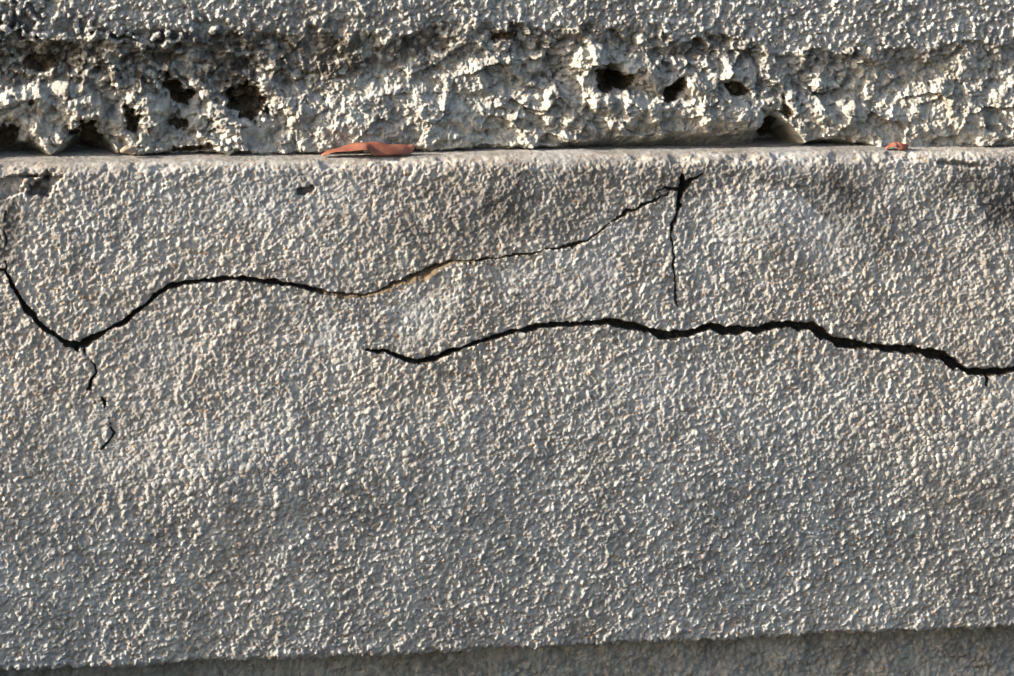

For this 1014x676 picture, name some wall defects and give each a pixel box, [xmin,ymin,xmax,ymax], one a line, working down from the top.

crack [0,173,1014,450]